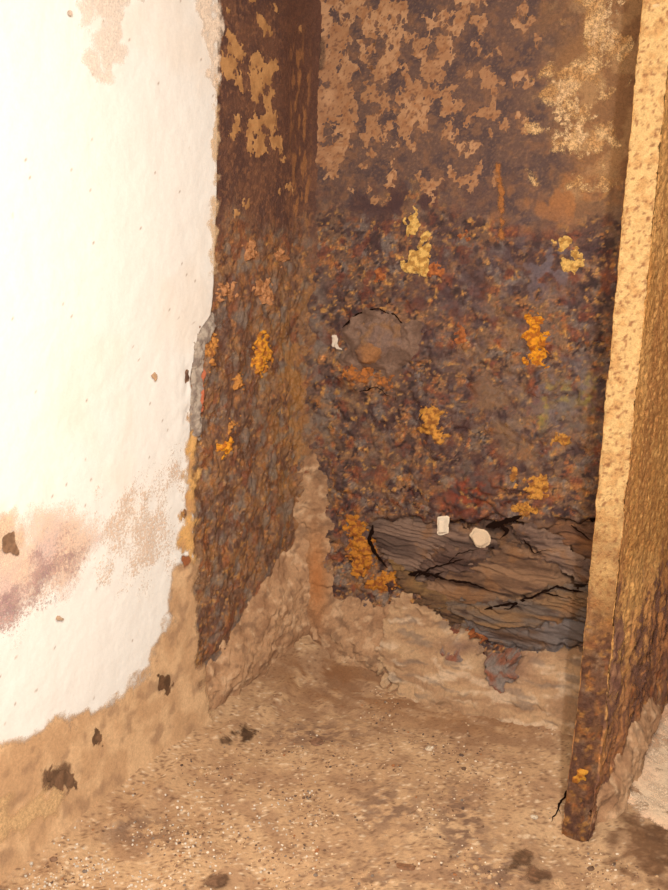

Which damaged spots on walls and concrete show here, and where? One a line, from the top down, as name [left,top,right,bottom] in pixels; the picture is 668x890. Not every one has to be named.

corrosion [400,206,445,277]
corrosion [551,236,585,275]
corrosion [521,307,550,369]
spalling [2,531,19,555]
leakage [0,483,170,631]
crack [367,525,388,568]
peeling [437,516,450,535]
corrosion [342,466,595,654]
peeling [470,527,491,548]
crack [408,549,583,610]
crack [486,515,552,554]
leakage [0,559,214,884]